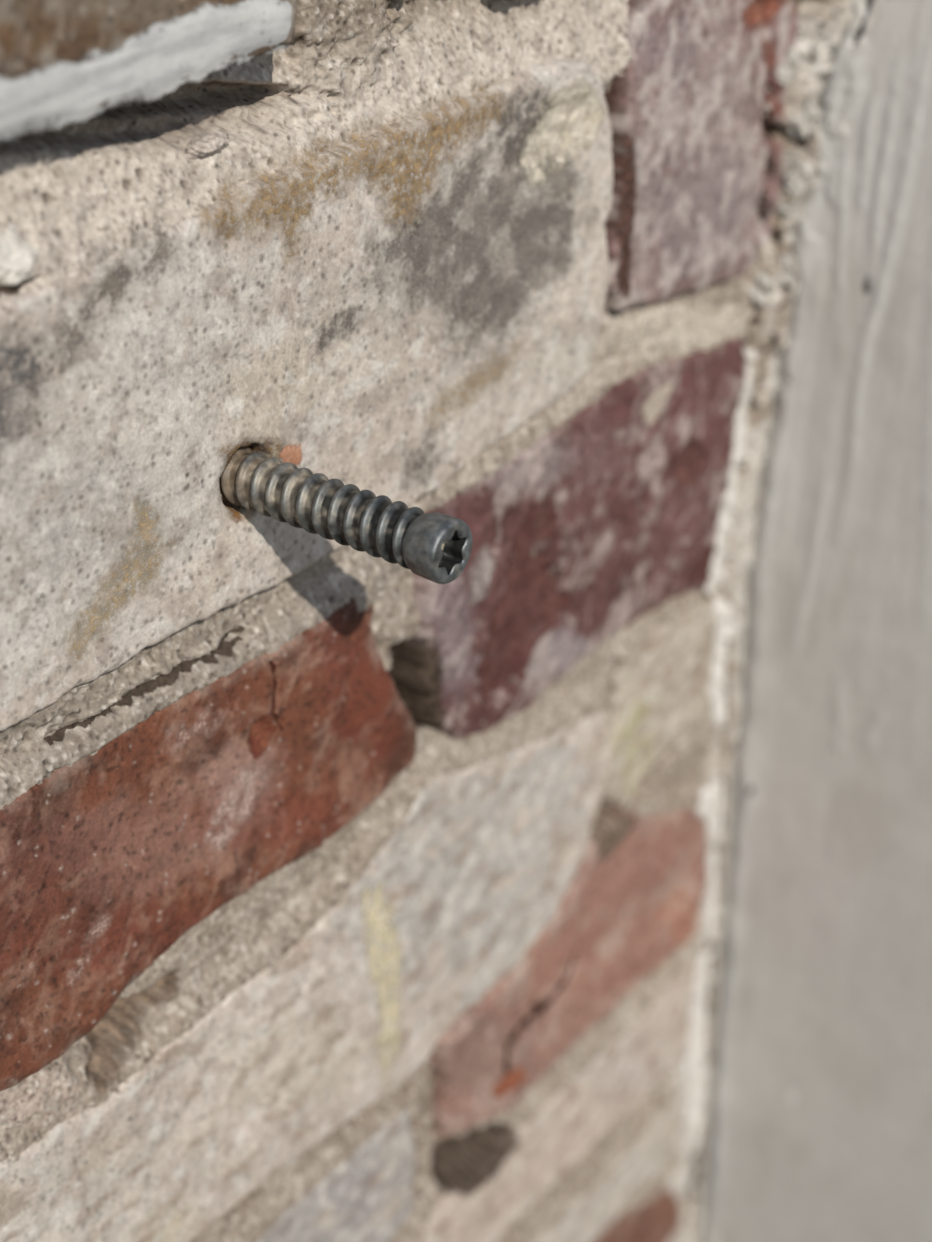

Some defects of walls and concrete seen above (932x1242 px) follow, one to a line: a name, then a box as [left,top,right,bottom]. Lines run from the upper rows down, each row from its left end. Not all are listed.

spalling [742,0,788,29]
spalling [761,25,824,148]
spalling [776,159,815,220]
spalling [746,253,800,305]
crack [44,626,244,745]
crack [269,660,283,731]
crack [504,950,576,1074]